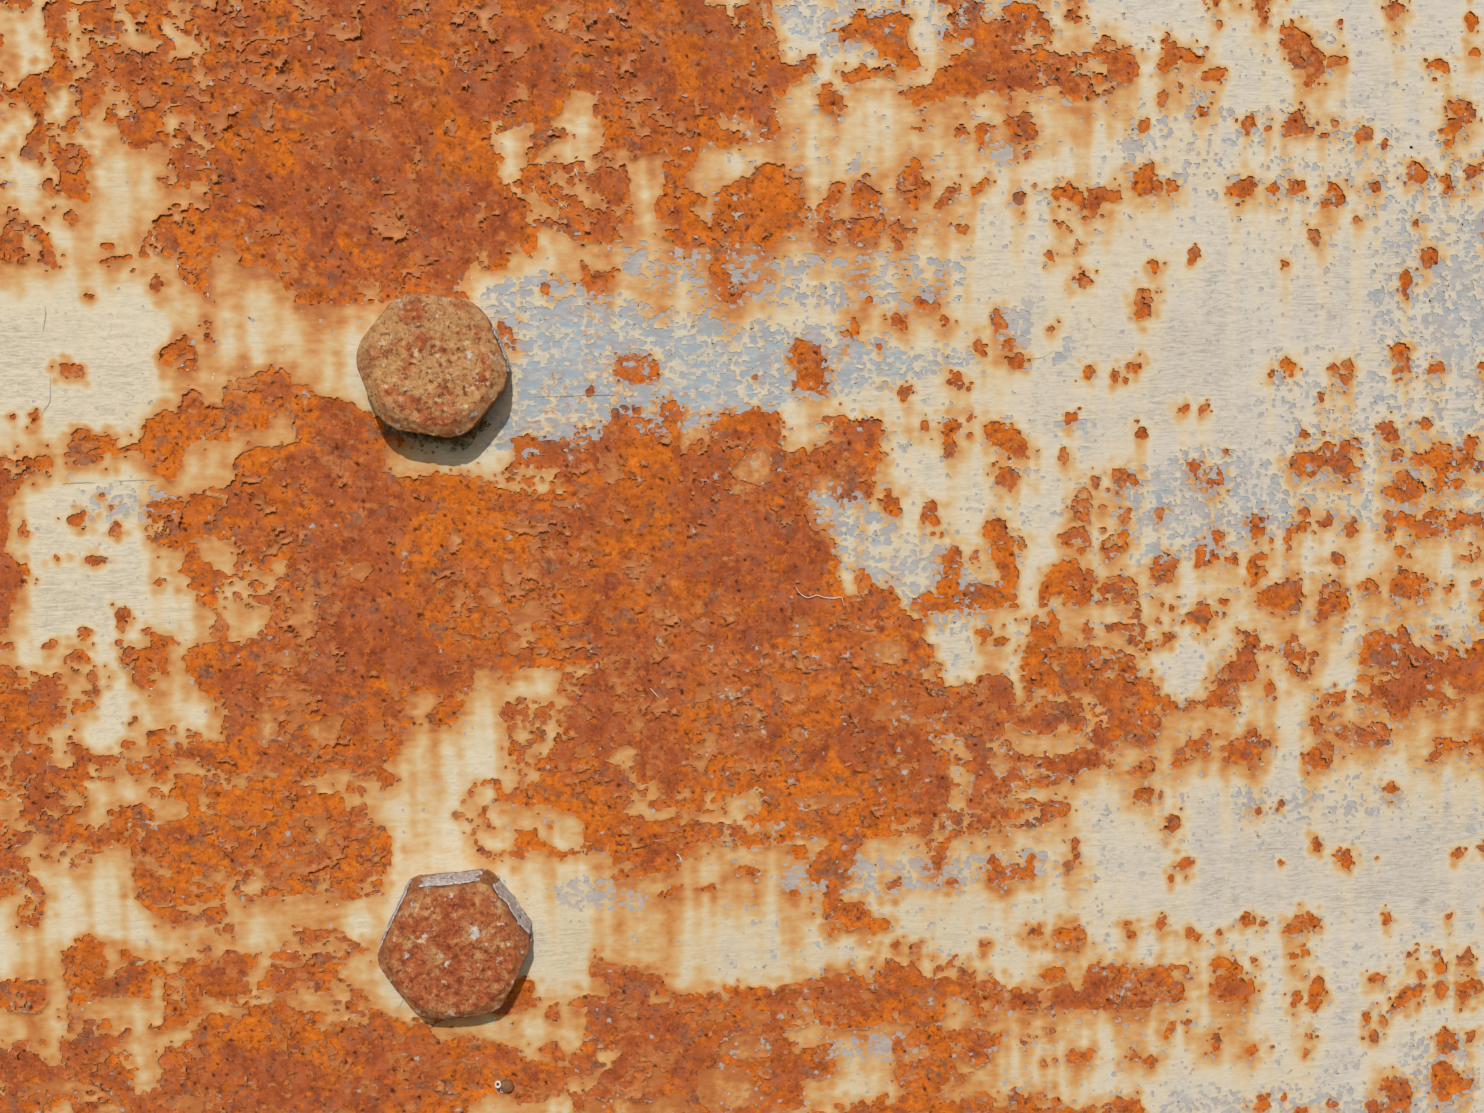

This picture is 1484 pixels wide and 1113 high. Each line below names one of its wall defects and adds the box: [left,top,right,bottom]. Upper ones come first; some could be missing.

peeling [482,245,975,460]
corrosion [1075,408,1172,533]
corrosion [1161,387,1249,528]
peeling [1115,97,1484,564]
corrosion [1249,332,1375,657]
corrosion [1328,562,1484,835]
peeling [1344,612,1484,665]
peeling [829,1034,908,1060]
peeling [781,851,1048,895]
corrosion [1137,792,1352,1113]
peeling [1161,1033,1482,1113]
corrosion [1351,832,1484,1113]